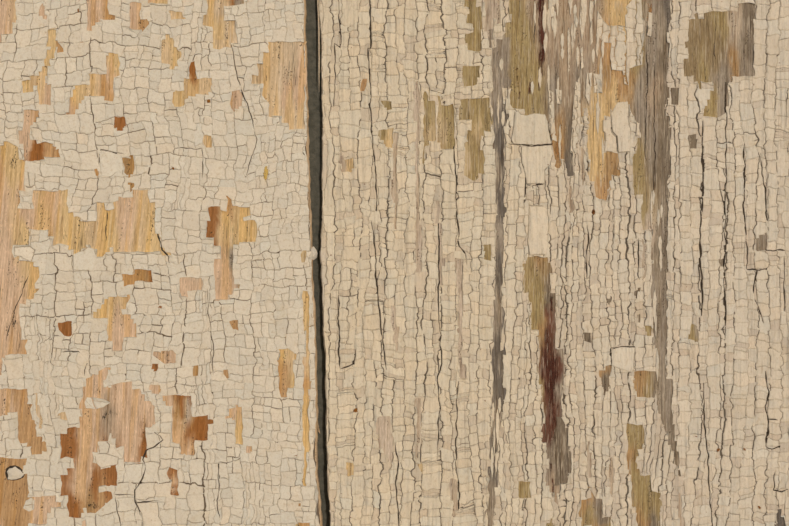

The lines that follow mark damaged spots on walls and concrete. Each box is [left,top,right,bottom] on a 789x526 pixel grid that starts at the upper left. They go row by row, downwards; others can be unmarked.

peeling [0,28,171,375]
peeling [0,365,214,526]
peeling [206,196,259,301]
peeling [251,41,307,130]
crack [337,296,356,369]
crack [367,0,386,366]
crack [436,146,467,509]
peeling [413,0,681,526]
crack [697,121,705,316]
peeling [683,3,756,119]
crack [723,82,785,333]
crack [765,371,780,450]